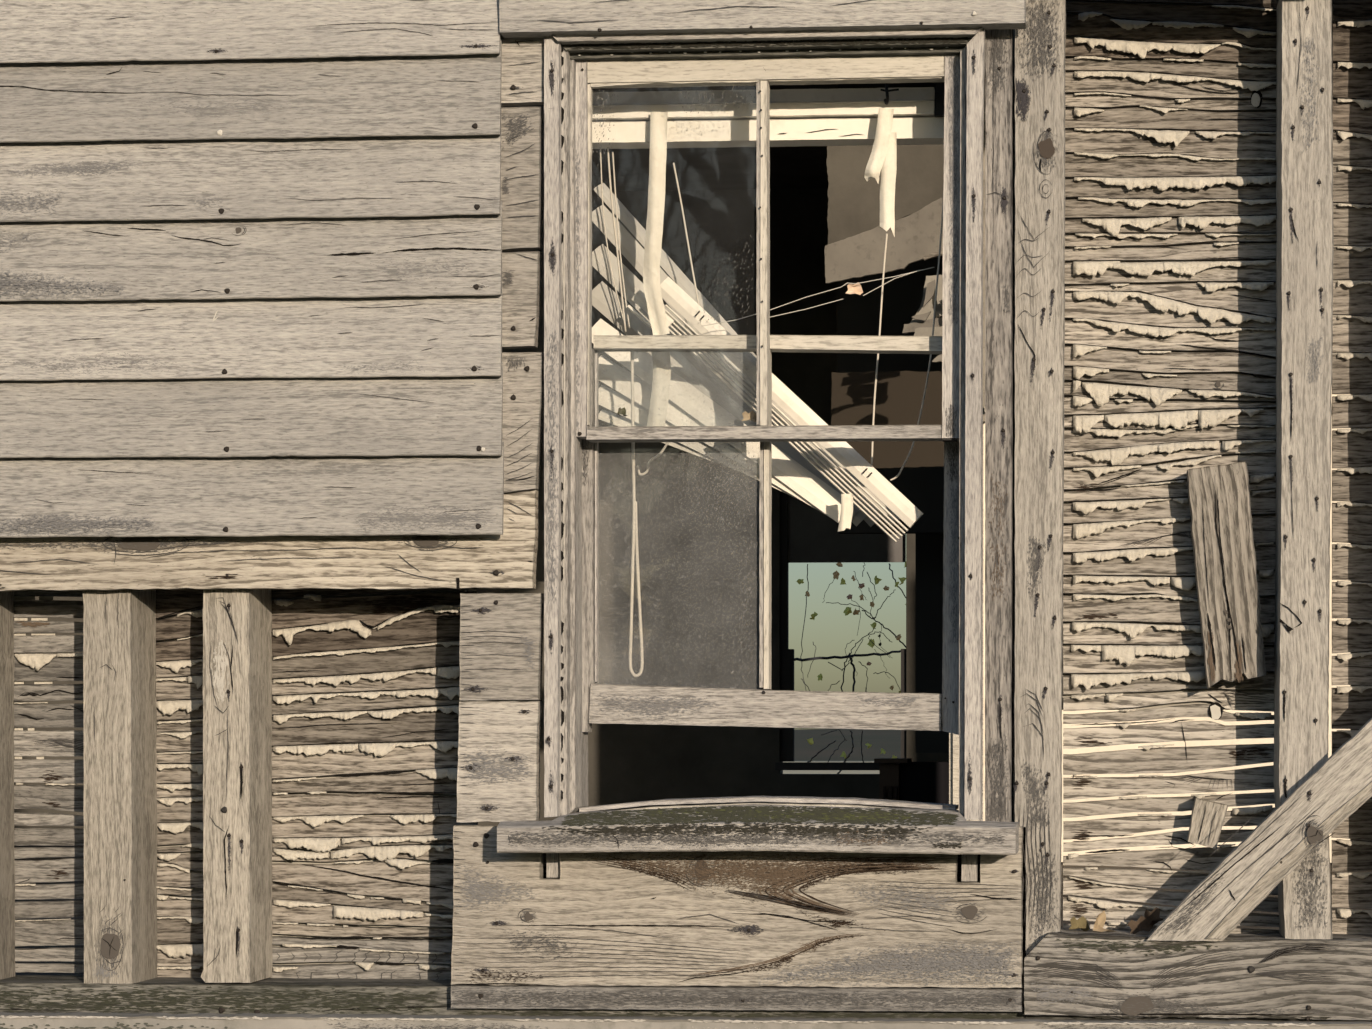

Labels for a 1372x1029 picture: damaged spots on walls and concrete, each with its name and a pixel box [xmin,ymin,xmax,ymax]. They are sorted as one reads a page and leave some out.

crack [0,69,334,96]
crack [249,146,350,154]
peeling [1073,5,1277,353]
crack [87,205,246,293]
crack [288,135,540,351]
peeling [1073,344,1275,478]
peeling [1073,498,1198,602]
peeling [273,605,460,660]
peeling [273,666,466,724]
peeling [1071,622,1205,701]
peeling [273,814,457,869]
leakage [330,735,1329,1029]